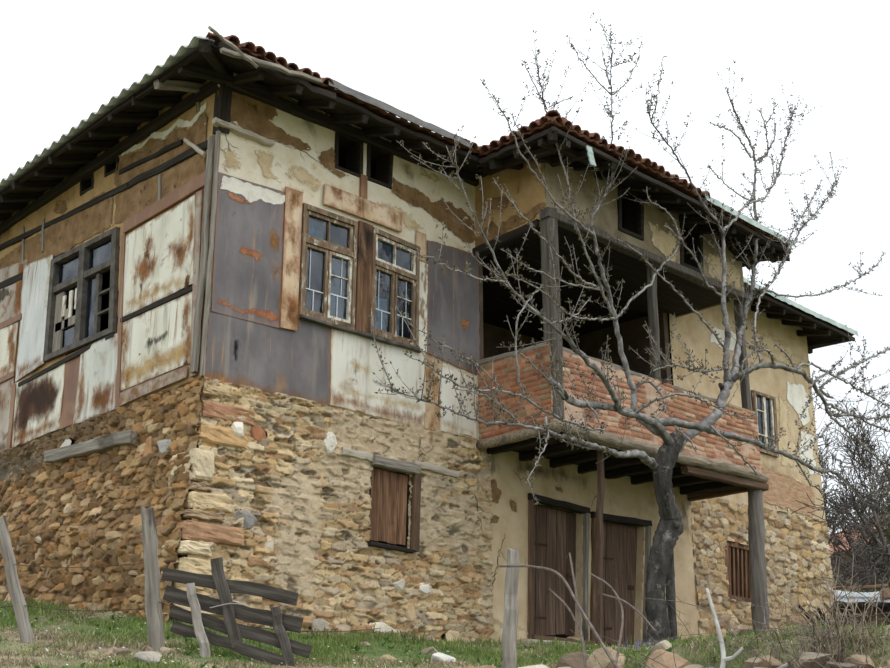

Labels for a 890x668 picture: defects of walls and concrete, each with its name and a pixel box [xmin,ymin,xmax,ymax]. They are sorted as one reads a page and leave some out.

spalling [220,91,350,205]
spalling [0,102,207,269]
spalling [378,177,546,247]
rust [137,238,156,279]
rust [173,216,193,262]
rust [0,263,24,314]
rust [218,299,278,321]
rust [1,326,36,375]
rust [121,304,191,382]
rust [14,377,58,443]
rust [77,378,122,418]